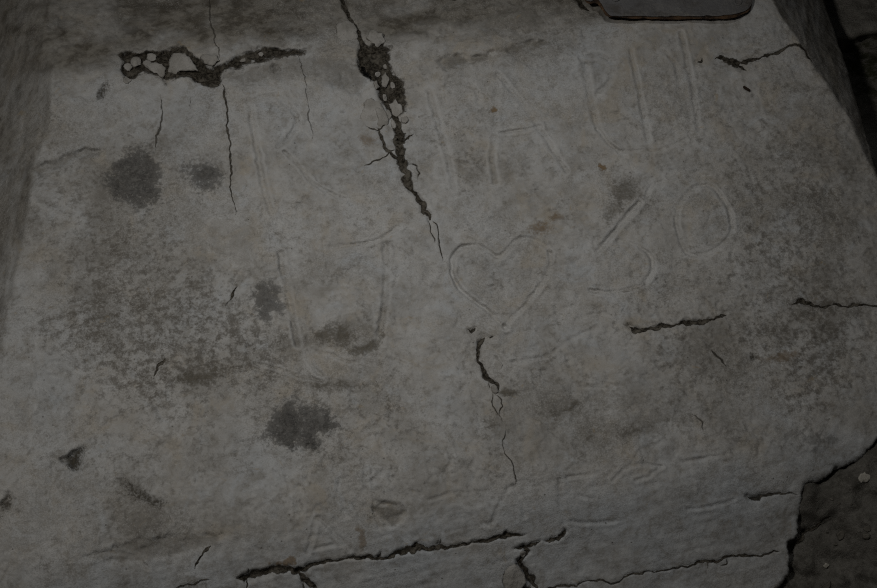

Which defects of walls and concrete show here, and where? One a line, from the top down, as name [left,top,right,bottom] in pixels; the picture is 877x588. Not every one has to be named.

crack [697,43,812,70]
crack [222,84,236,210]
crack [340,0,443,258]
crack [630,314,726,334]
crack [791,298,877,308]
crack [467,328,516,483]
crack [747,492,794,501]
crack [237,516,830,588]